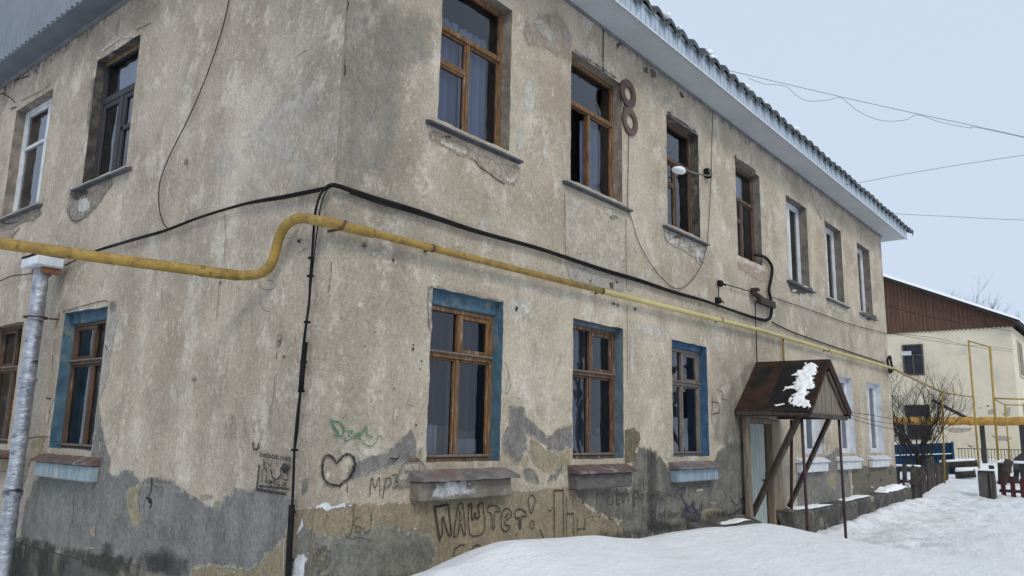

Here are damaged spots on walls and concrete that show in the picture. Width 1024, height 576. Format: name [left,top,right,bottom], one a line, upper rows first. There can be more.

spalling [66,178,112,223]
spalling [430,130,520,186]
spalling [664,231,708,265]
flaking render [20,301,436,576]
flaking render [502,396,573,484]
flaking render [577,428,745,539]